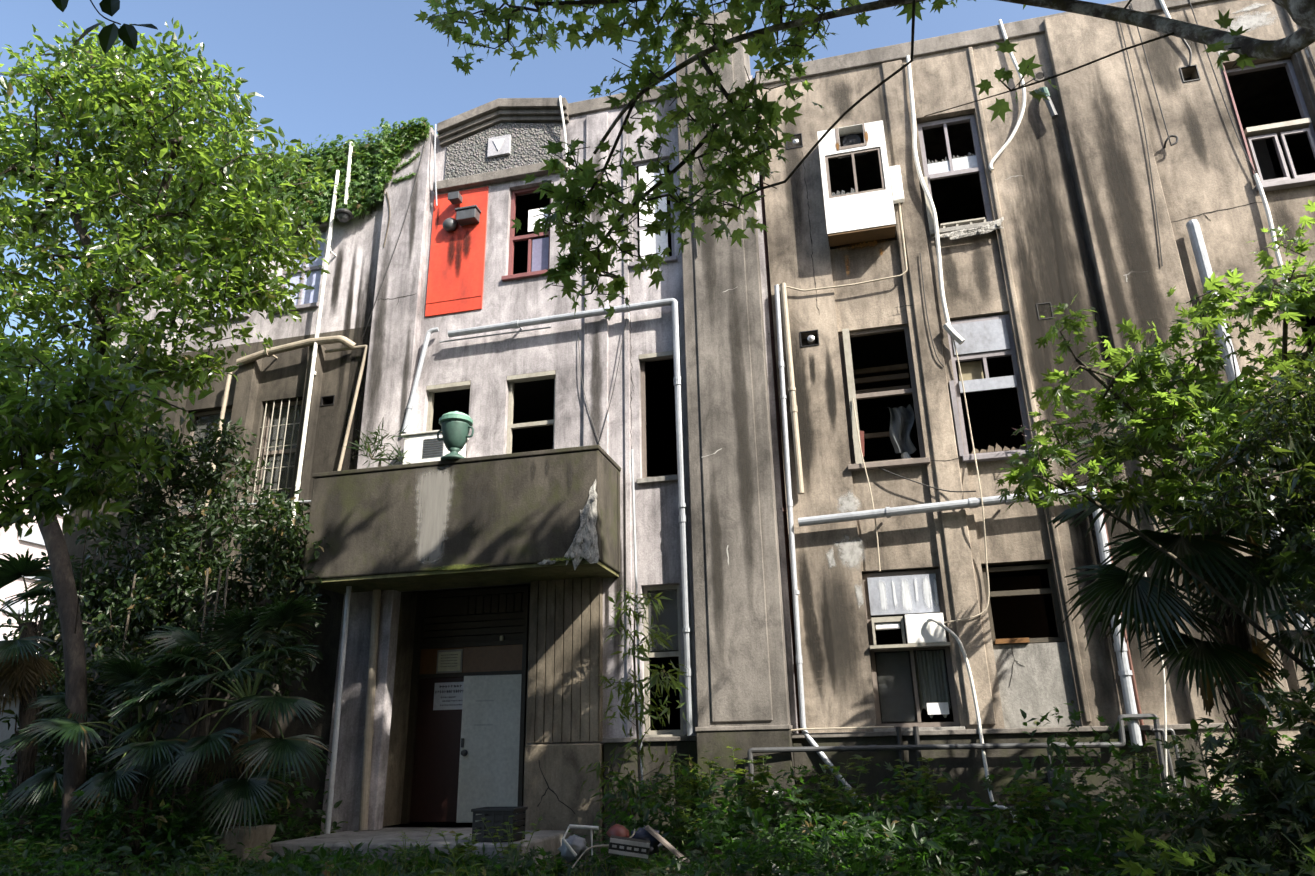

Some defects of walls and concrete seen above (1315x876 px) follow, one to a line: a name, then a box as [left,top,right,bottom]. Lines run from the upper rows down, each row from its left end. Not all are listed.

damp [1144,35,1196,89]
damp [1188,111,1206,160]
damp [448,216,470,274]
damp [701,125,715,290]
damp [332,250,387,471]
damp [400,339,409,428]
damp [731,280,752,564]
damp [1015,94,1171,671]
damp [416,470,453,562]
spalling [537,479,599,571]
damp [712,498,723,630]
damp [1180,569,1214,642]